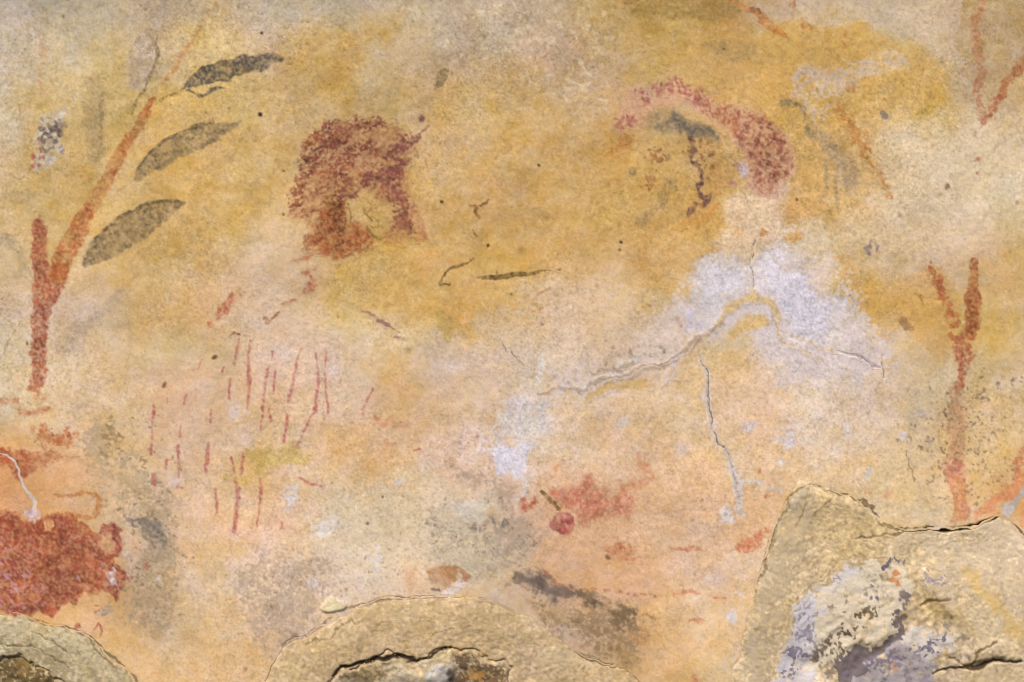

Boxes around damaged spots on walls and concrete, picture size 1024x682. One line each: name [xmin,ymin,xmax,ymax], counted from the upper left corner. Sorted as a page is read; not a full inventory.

crack [749,239,757,286]
crack [835,348,886,378]
crack [696,352,784,520]